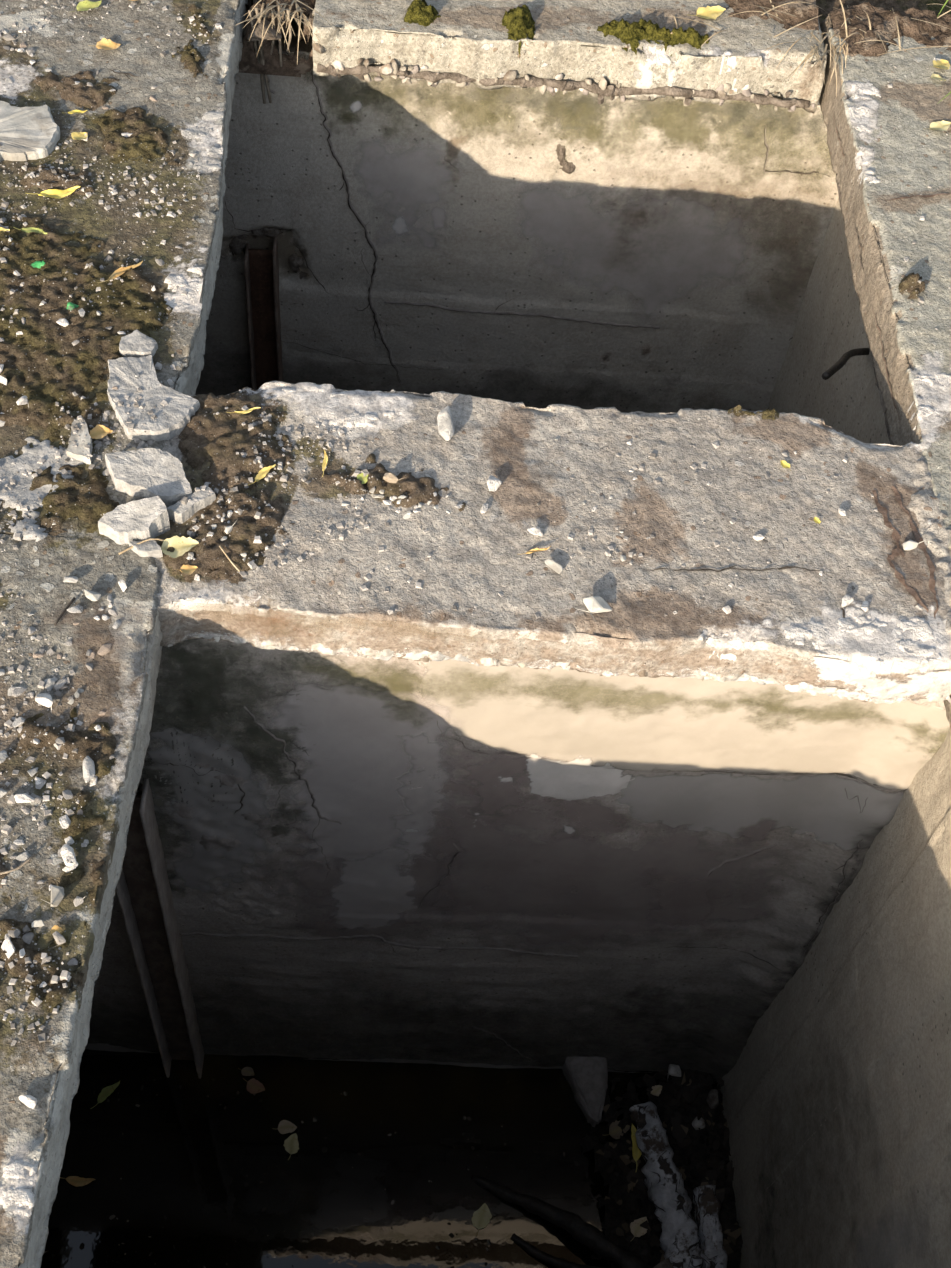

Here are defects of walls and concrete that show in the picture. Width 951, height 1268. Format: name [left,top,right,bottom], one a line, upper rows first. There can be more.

water stain [331,75,378,121]
water stain [504,88,616,142]
water stain [635,45,824,150]
crack [763,115,847,177]
flaking render [223,227,310,279]
crack [283,73,660,383]
water stain [521,190,746,313]
crack [640,565,837,575]
water stain [697,600,951,704]
crack [243,706,342,881]